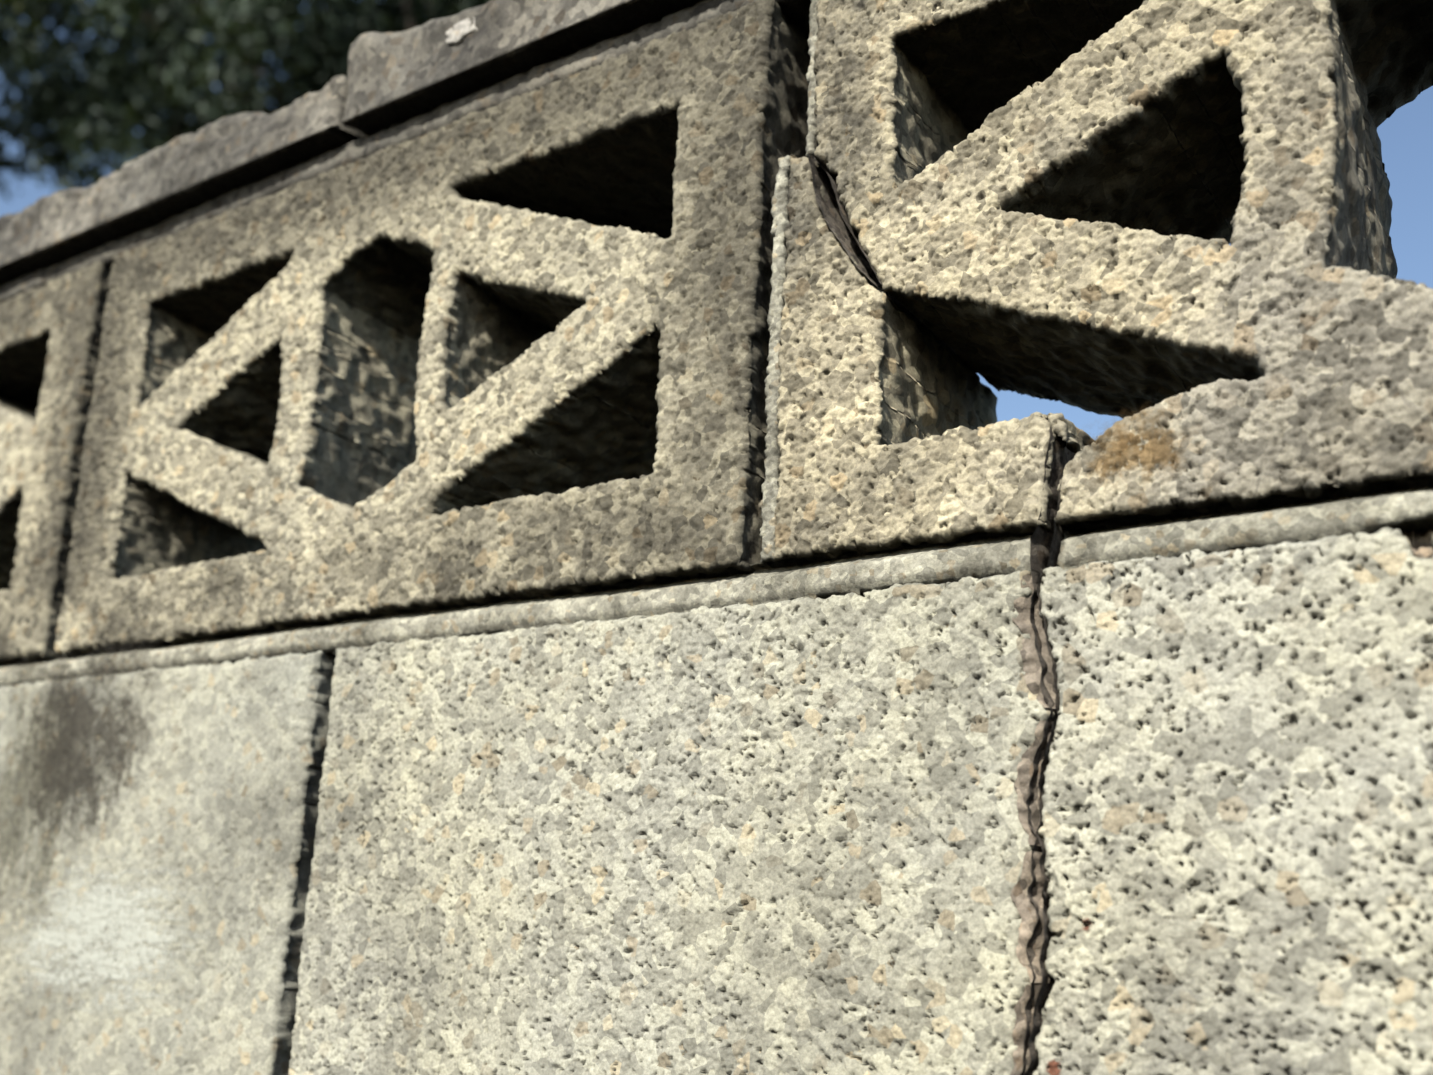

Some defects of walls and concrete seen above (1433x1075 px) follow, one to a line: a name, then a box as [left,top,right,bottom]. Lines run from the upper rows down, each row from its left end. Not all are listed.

crack [808,153,928,330]
damp [38,675,135,813]
crack [1010,426,1076,1075]